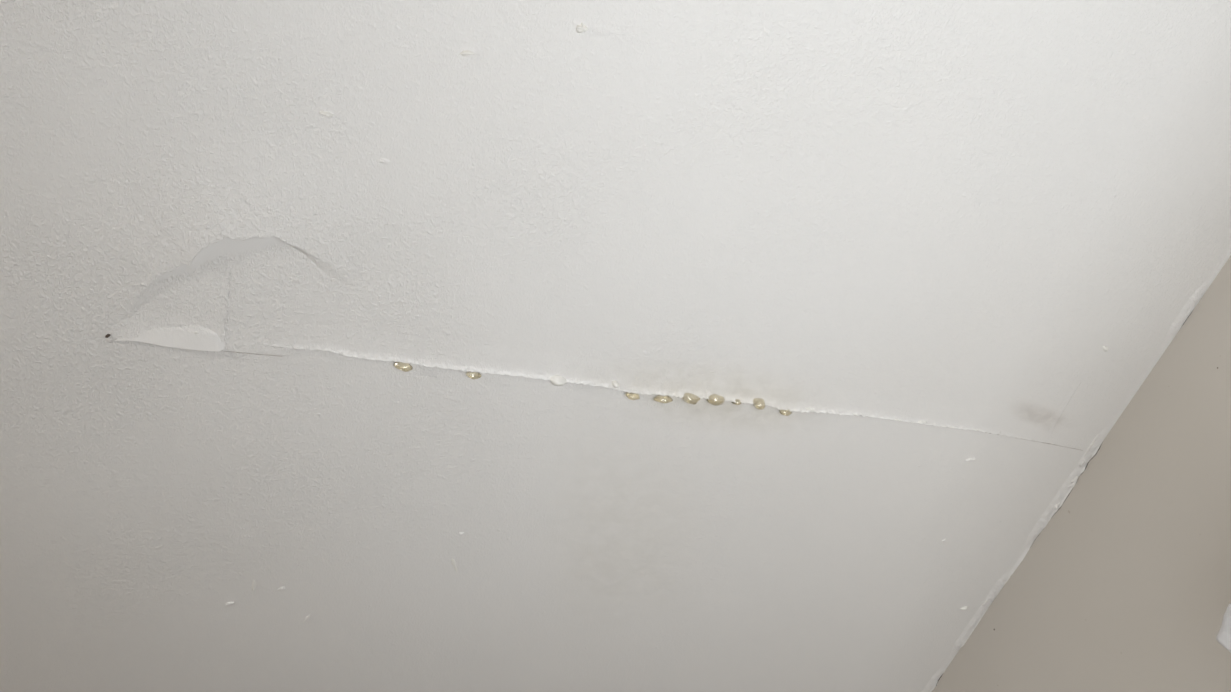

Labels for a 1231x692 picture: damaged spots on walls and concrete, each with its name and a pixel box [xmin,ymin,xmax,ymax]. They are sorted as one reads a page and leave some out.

crack [106,245,1231,692]